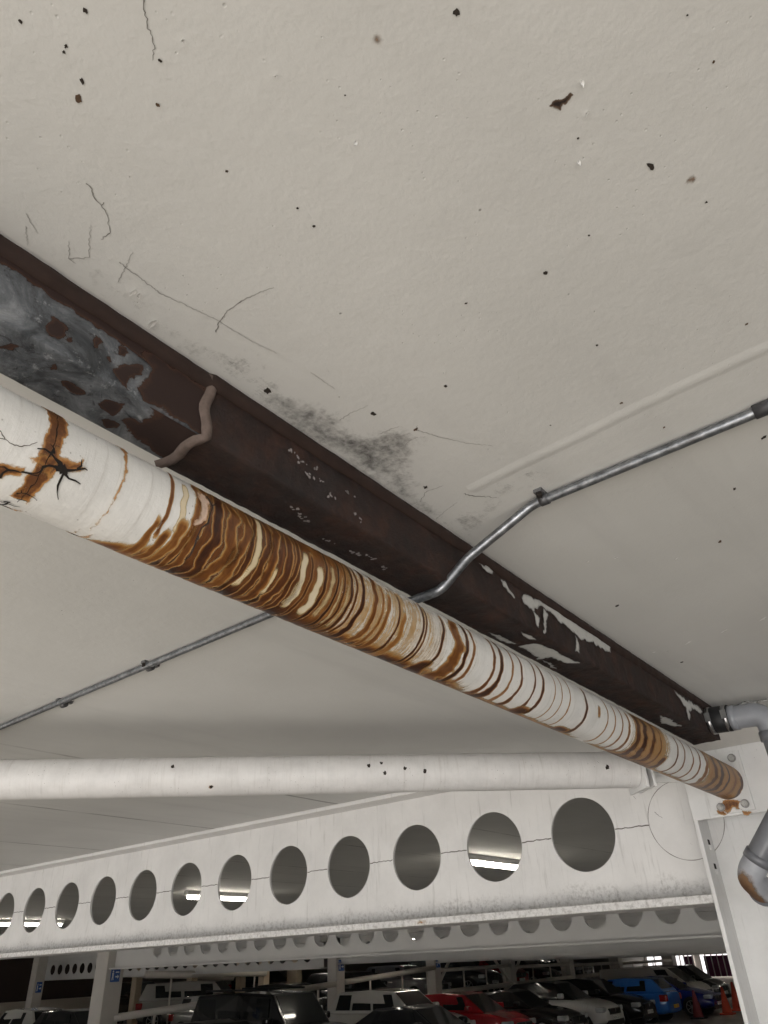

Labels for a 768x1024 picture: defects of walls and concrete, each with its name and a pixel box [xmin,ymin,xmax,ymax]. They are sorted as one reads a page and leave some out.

crack [143,0,155,55]
crack [68,183,111,263]
crack [118,253,274,351]
crack [0,411,88,507]
water stain [303,413,400,469]
rust [0,255,751,816]
peeling [481,564,611,668]
peeling [660,690,702,726]
rust [738,872,767,903]